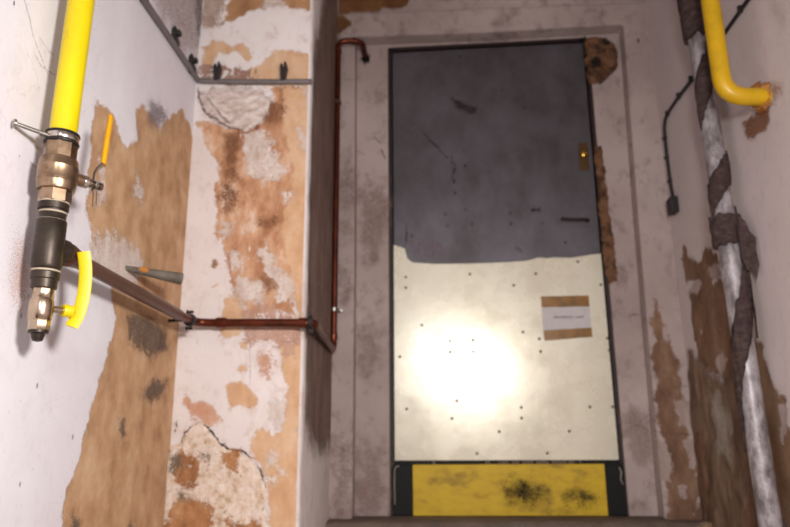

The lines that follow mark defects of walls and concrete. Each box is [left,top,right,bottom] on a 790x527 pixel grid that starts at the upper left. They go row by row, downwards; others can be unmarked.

crack [24,0,57,83]
peeling [220,0,310,25]
spalling [579,36,618,85]
spalling [750,80,774,115]
peeling [61,39,309,527]
spalling [594,146,618,285]
peeling [680,245,734,384]
peeling [647,296,712,527]
peeling [754,339,790,527]